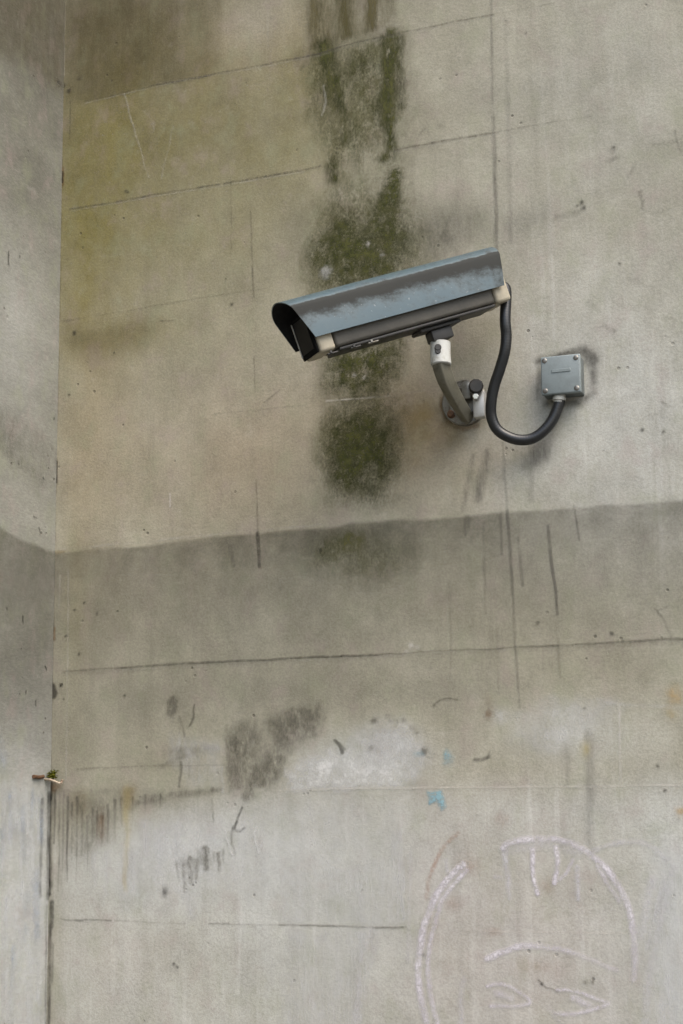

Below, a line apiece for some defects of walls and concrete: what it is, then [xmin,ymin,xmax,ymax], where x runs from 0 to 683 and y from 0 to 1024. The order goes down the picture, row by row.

damp [310,0,402,161]